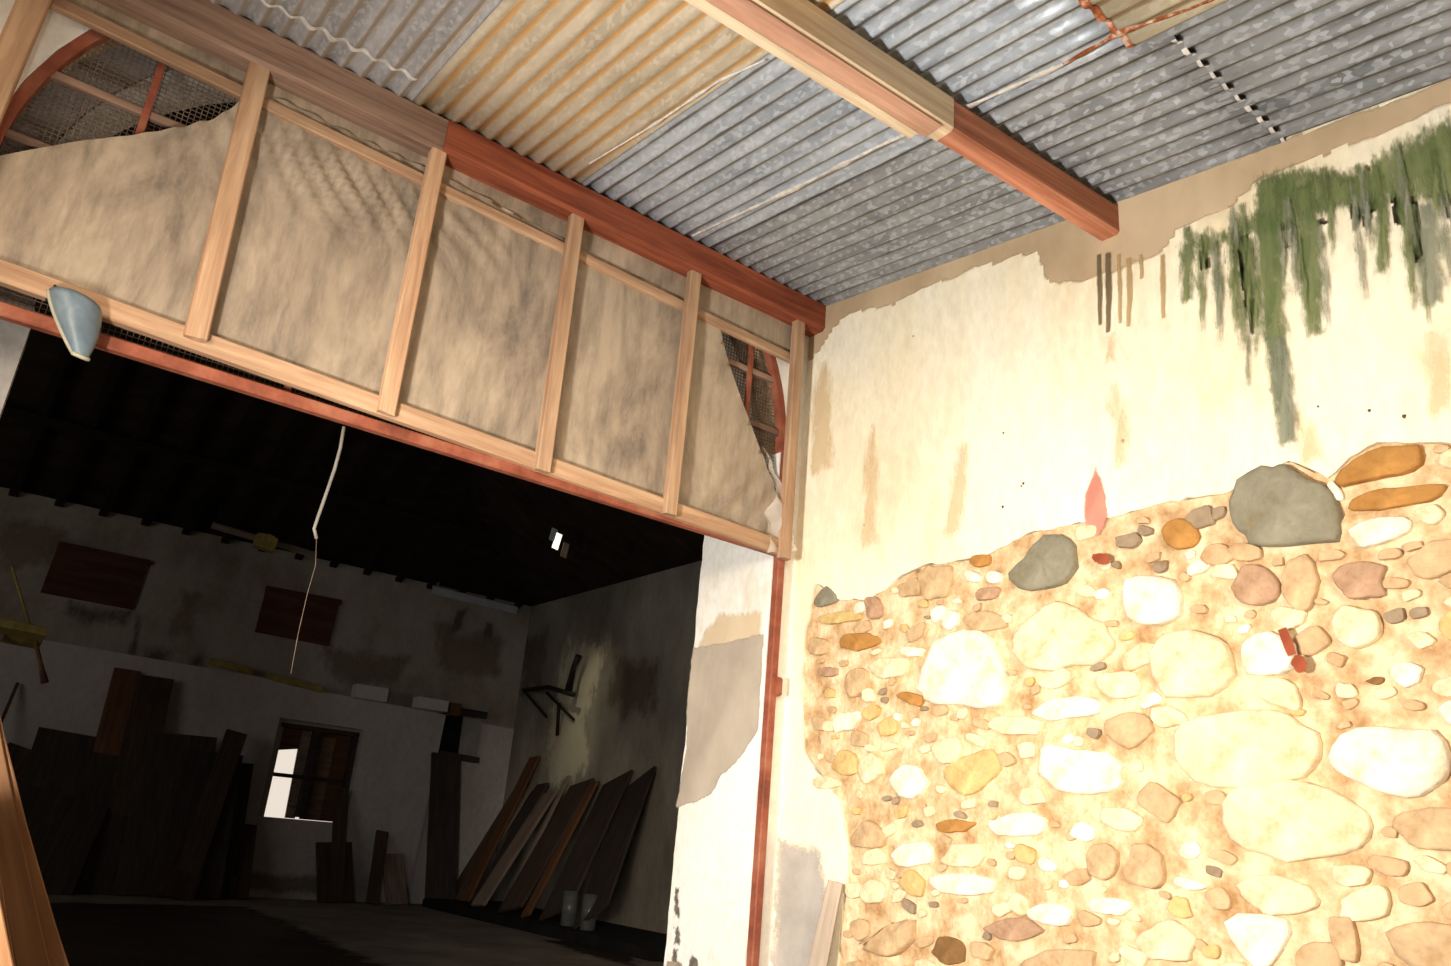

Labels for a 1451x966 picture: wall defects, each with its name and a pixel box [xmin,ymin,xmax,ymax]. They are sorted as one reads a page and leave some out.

corrosion [963,0,1215,109]
corrosion [1171,39,1285,143]
corrosion [692,134,905,236]
peeling [808,79,1451,361]
damp [1097,253,1165,332]
flaking render [676,635,763,807]
flaking render [803,443,1451,966]